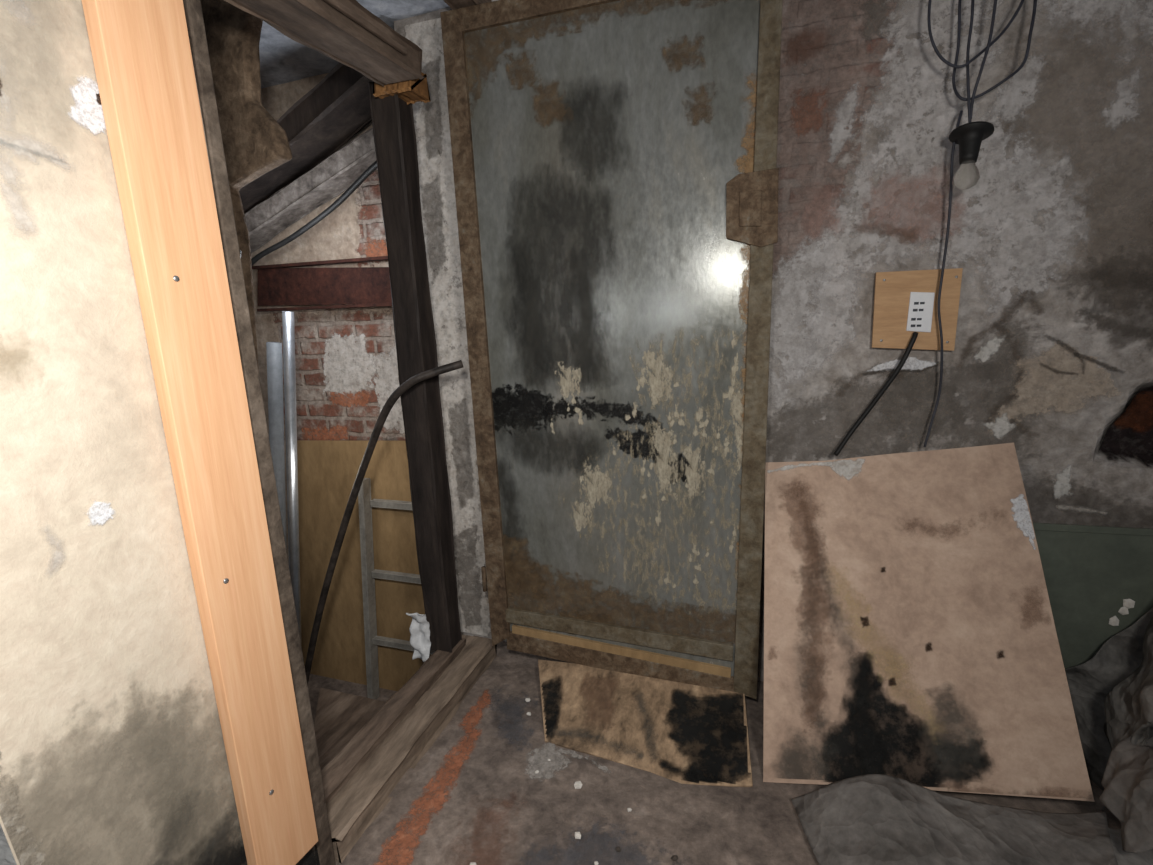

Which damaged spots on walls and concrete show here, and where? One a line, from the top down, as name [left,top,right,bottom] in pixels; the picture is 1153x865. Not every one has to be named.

peeling [555,362,584,425]
peeling [974,337,1003,362]
peeling [985,344,1153,467]
peeling [563,330,746,615]
spalling [0,753,45,865]
leakage [4,693,247,865]
leakage [296,844,320,865]
leakage [525,678,611,779]
leakage [637,690,751,784]
leakage [780,654,991,787]